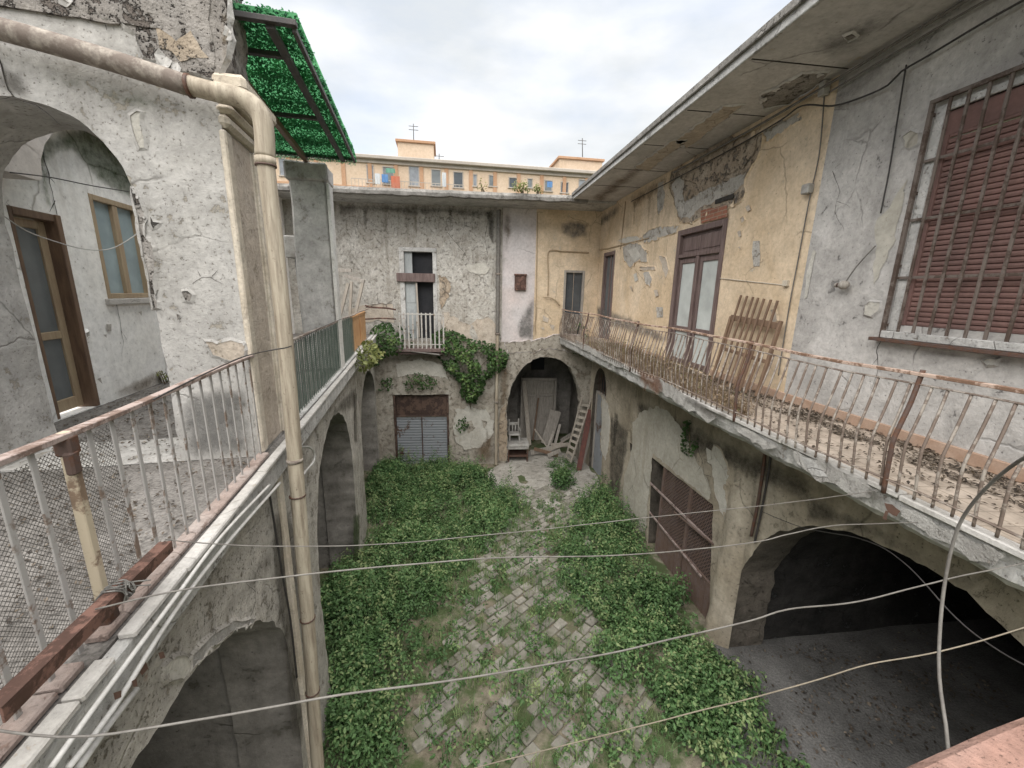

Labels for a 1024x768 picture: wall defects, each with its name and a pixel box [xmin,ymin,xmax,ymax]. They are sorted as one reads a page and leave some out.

flaking render [0,0,249,83]
crack [43,153,57,214]
spalling [618,70,831,297]